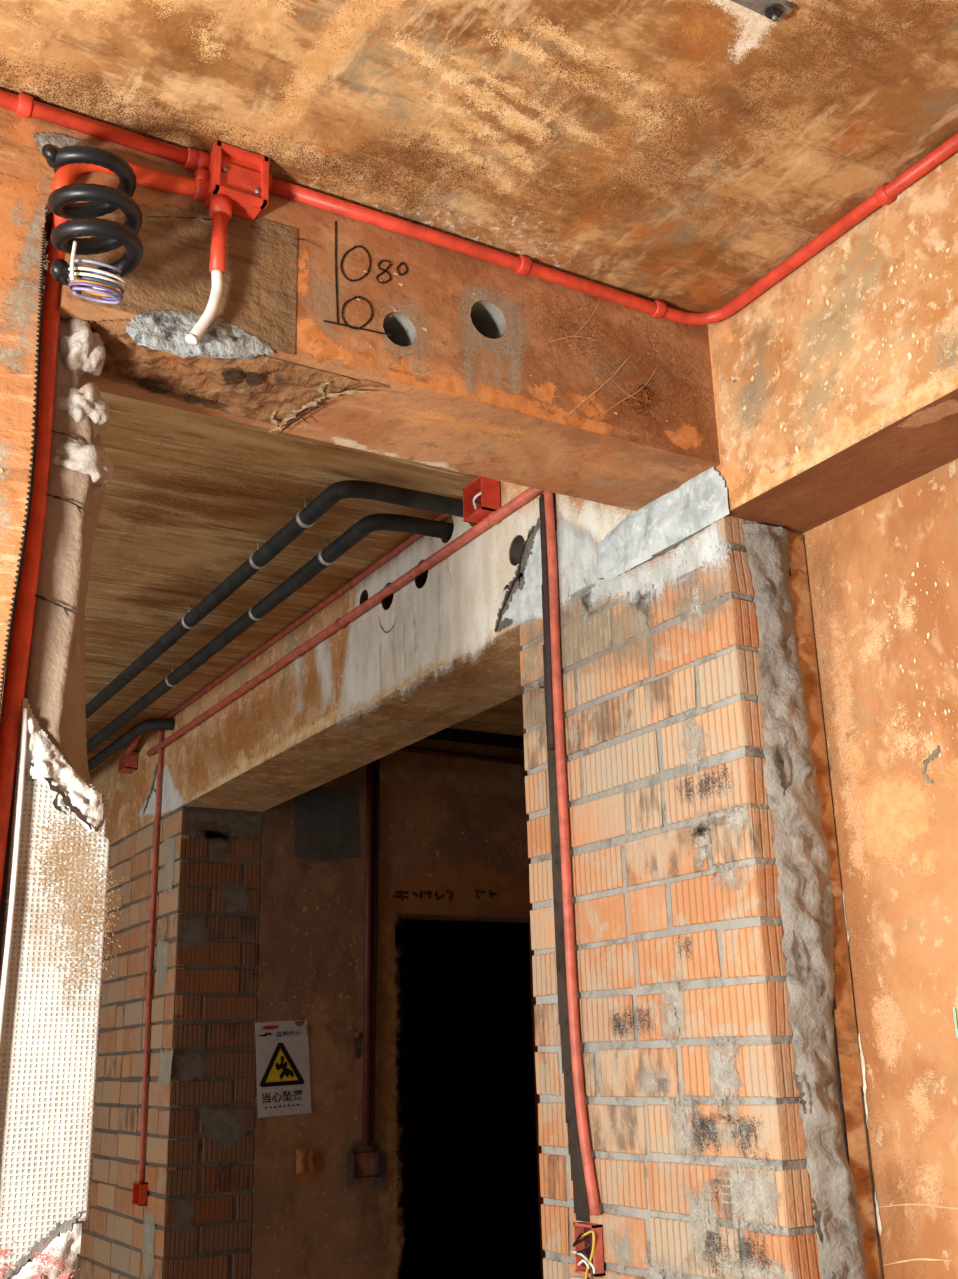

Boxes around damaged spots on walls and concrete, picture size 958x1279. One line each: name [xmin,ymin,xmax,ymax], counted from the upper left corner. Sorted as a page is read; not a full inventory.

peeling [296,248,313,298]
spalling [90,315,958,507]
crack [46,494,97,519]
crack [34,595,87,618]
crack [29,762,92,830]
crack [143,762,158,815]
water stain [668,760,732,807]
water stain [606,1002,655,1038]
water stain [685,1108,772,1166]
flaking render [13,1223,82,1279]
water stain [702,1221,774,1275]